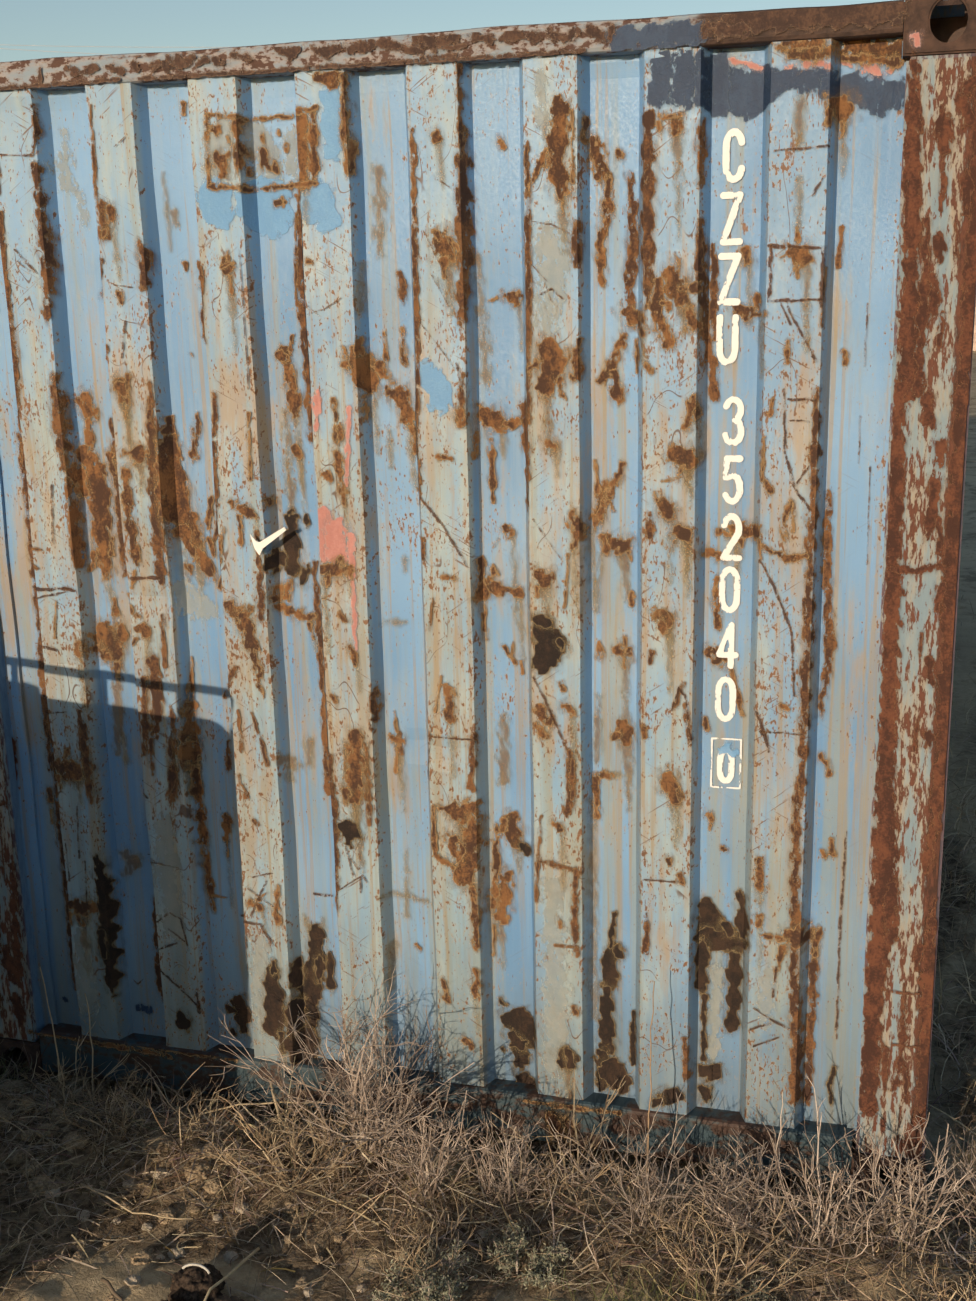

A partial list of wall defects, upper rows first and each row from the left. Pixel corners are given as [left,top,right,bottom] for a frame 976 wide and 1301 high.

corrosion [0,23,845,1141]
corrosion [700,0,976,1128]